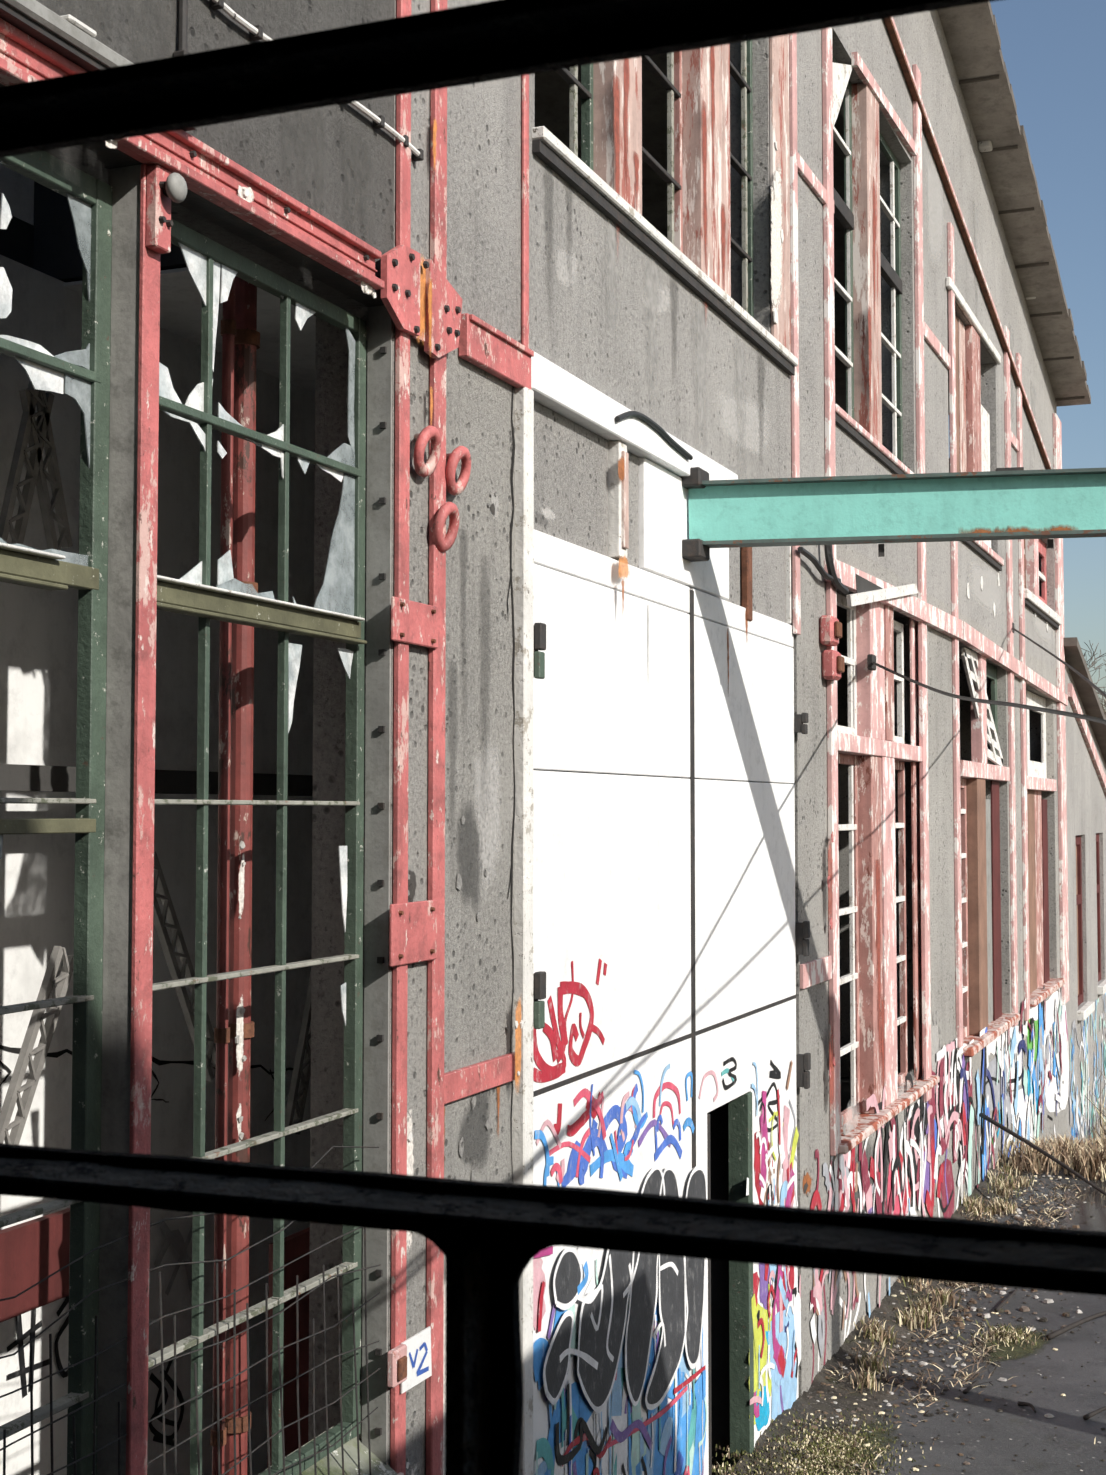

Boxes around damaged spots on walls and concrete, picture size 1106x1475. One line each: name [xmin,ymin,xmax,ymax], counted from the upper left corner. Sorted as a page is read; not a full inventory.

peeling [770,141,784,324]